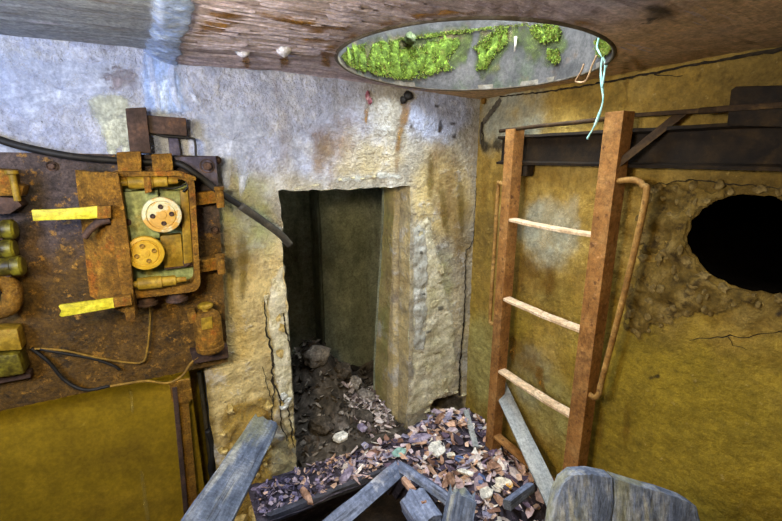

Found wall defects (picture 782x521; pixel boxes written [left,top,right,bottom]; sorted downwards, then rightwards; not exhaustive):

damp [2,68,130,154]
damp [143,0,199,113]
crack [652,179,778,189]
crack [262,301,295,448]
crack [458,176,477,396]
spalling [623,179,782,339]
crack [689,331,781,350]